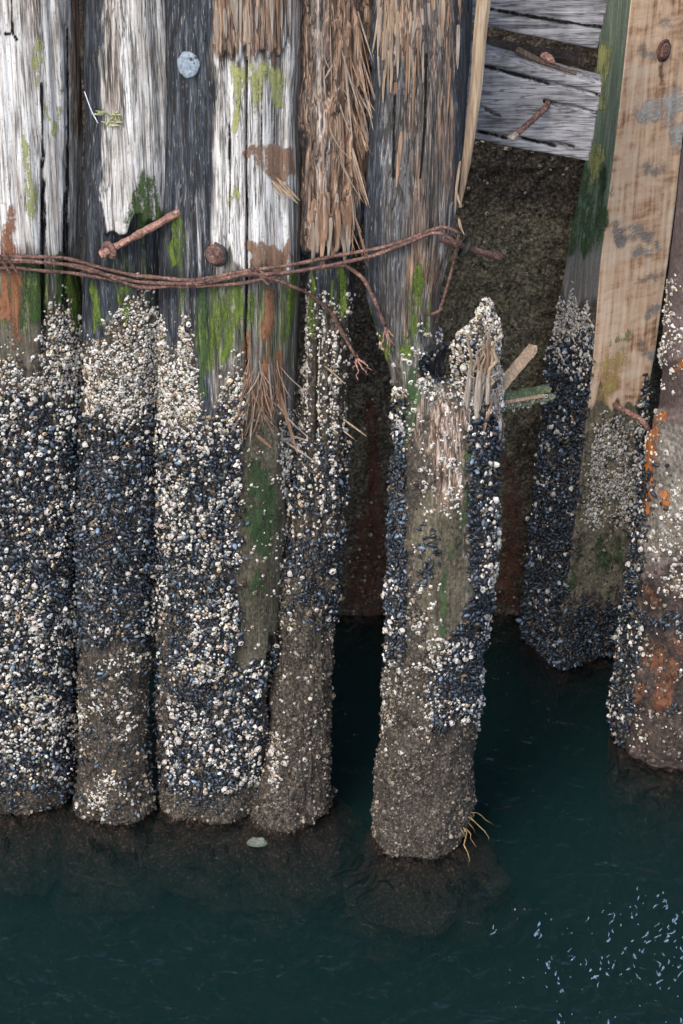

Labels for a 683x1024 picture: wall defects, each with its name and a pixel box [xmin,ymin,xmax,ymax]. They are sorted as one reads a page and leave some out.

rust [0,205,22,347]
rust [643,412,669,516]
rust [634,638,683,714]